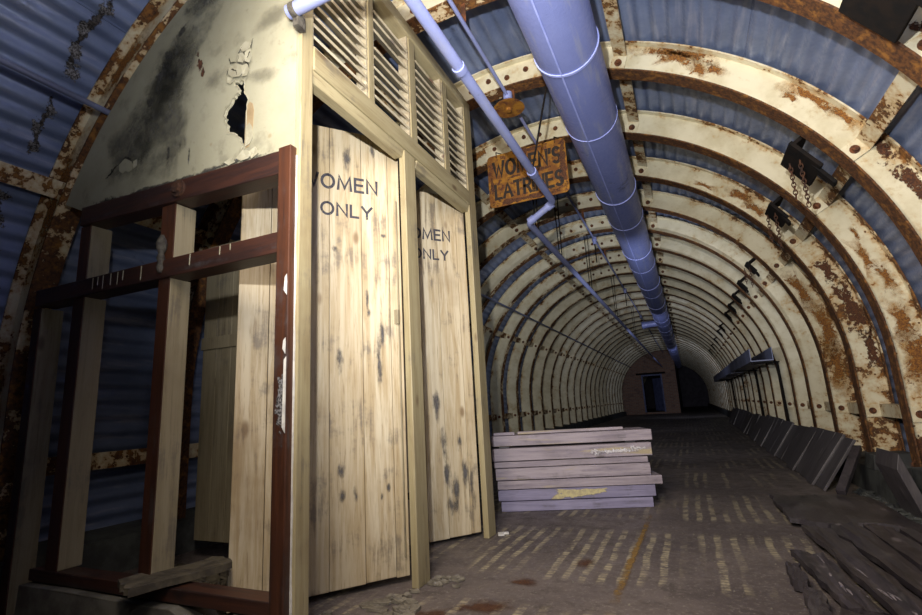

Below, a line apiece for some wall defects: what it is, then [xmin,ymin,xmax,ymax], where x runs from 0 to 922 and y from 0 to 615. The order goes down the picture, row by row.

corrosion [26,96,58,154]
corrosion [64,0,115,83]
corrosion [105,39,145,93]
damp [111,24,198,175]
spalling [223,41,259,165]
corrosion [645,47,722,76]
corrosion [783,84,860,124]
corrosion [874,138,922,200]
corrosion [850,229,898,290]
corrosion [784,275,847,389]
corrosion [813,259,883,373]
corrosion [888,304,922,384]